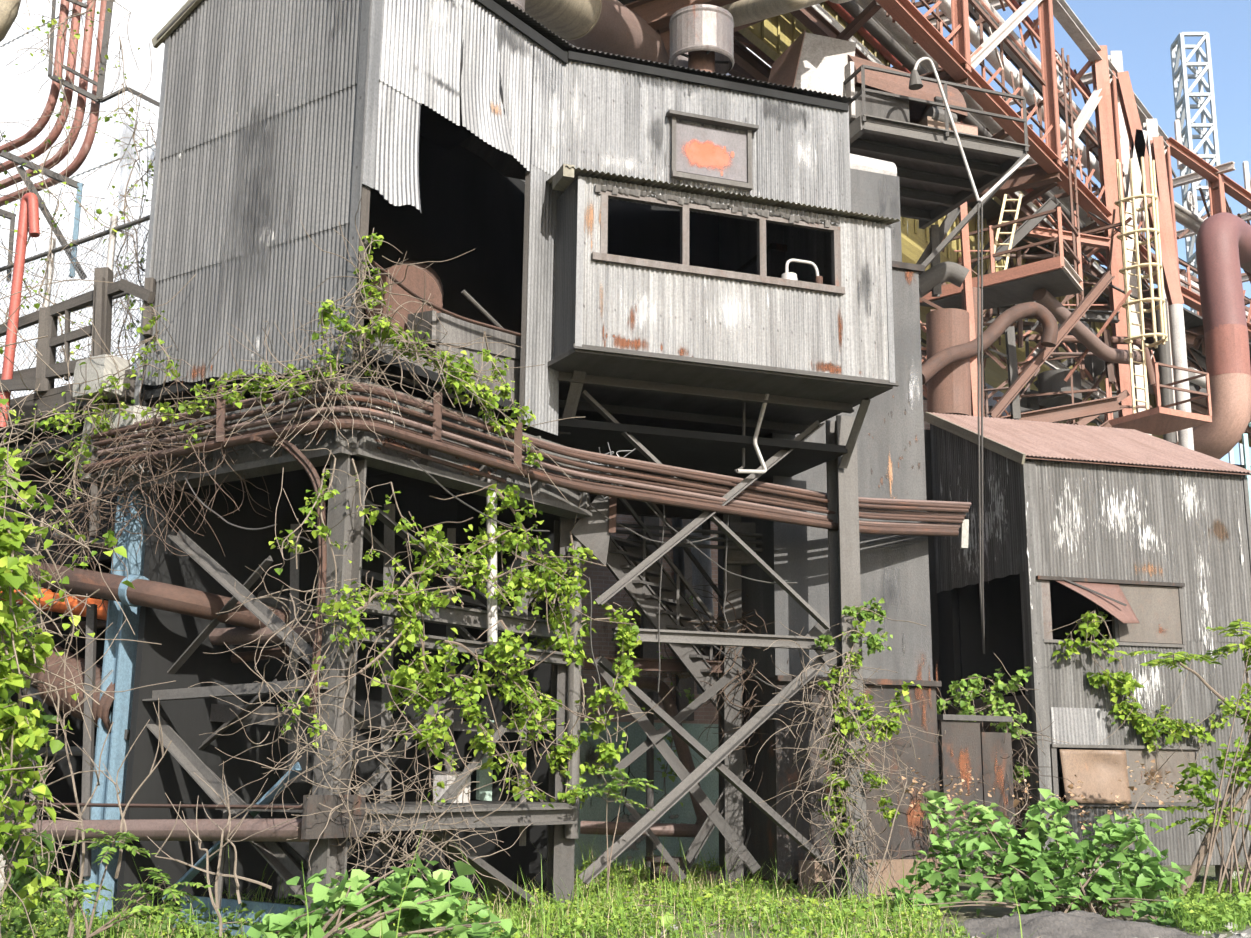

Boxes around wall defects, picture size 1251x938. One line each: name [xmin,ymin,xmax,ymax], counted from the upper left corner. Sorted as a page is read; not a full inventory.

corrosion [602,306,646,349]
corrosion [811,361,841,374]
peeling [1050,477,1172,562]
peeling [1173,475,1205,521]
peeling [1194,531,1215,678]
corrosion [951,750,971,794]